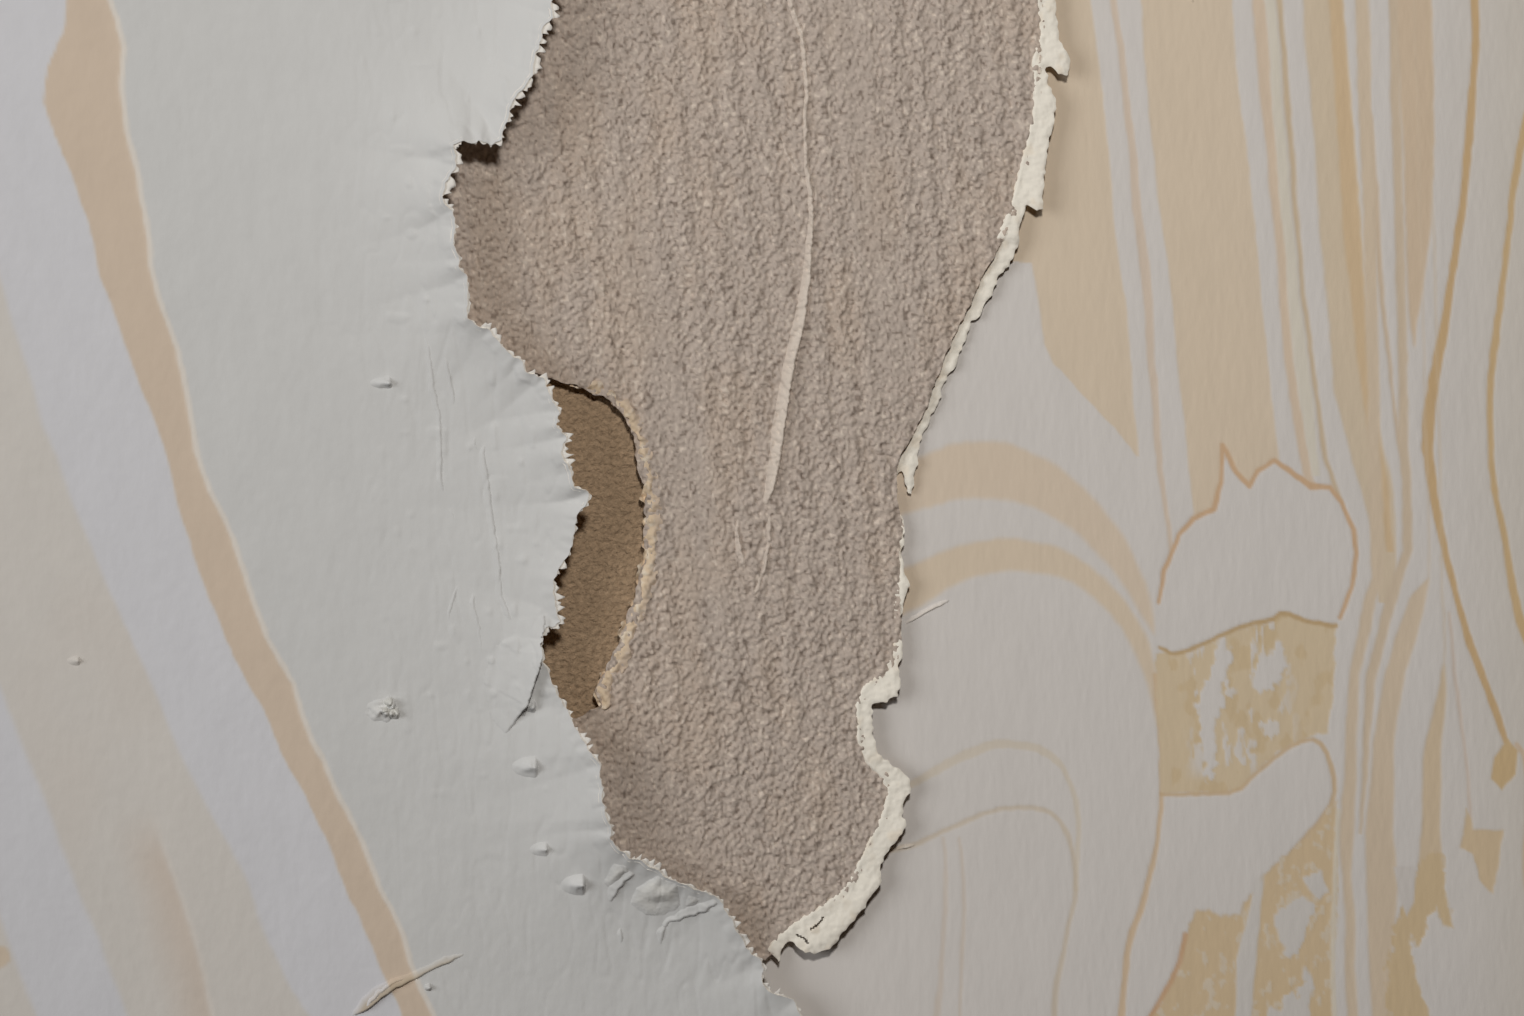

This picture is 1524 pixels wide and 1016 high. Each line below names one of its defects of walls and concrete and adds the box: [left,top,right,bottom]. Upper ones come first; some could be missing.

peeling [521,699,536,716]
spalling [604,864,718,944]